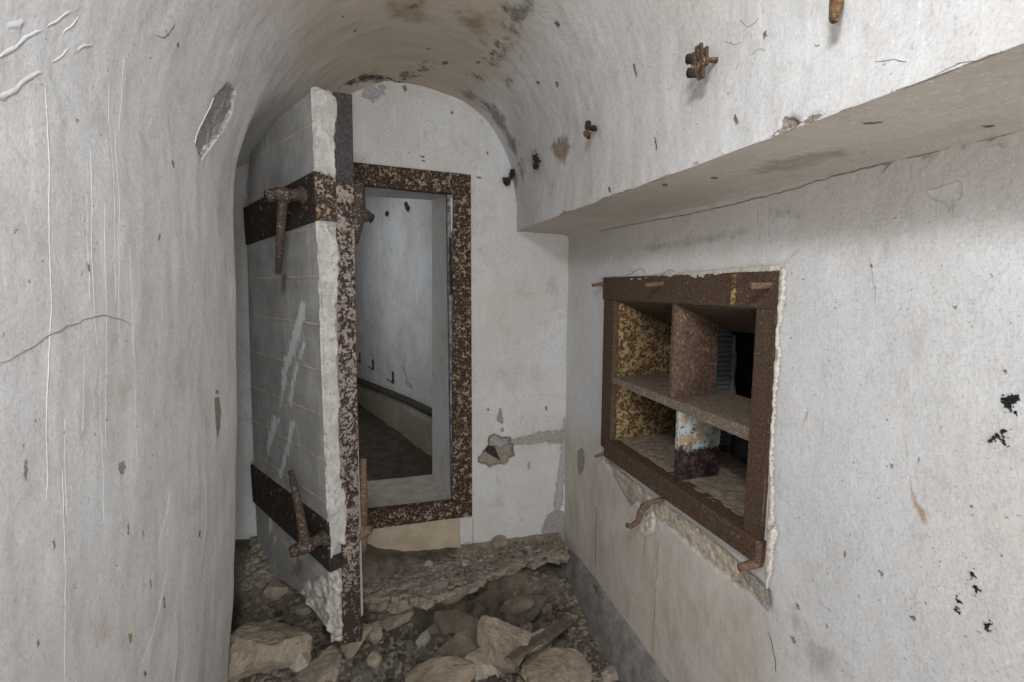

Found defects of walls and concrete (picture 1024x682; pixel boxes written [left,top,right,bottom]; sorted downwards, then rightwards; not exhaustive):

flaking render [195,84,234,160]
crack [0,315,130,363]
spalling [478,408,515,468]
flaking render [605,264,787,611]